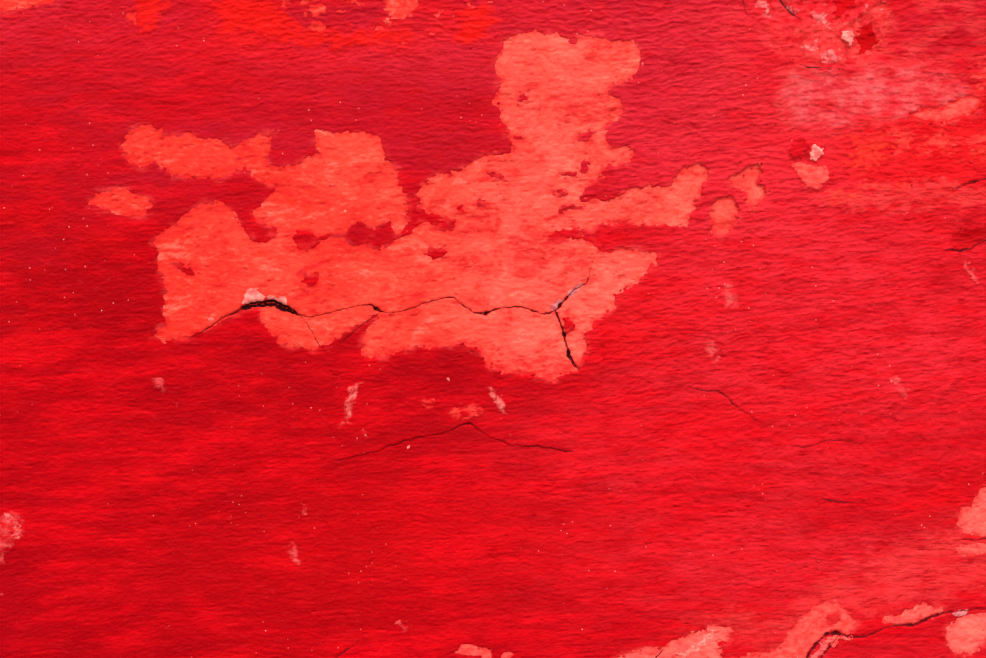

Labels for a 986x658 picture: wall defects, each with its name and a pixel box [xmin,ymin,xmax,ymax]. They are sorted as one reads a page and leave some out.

peeling [281,0,365,35]
peeling [375,0,419,30]
peeling [121,29,709,383]
peeling [709,163,767,234]
crack [192,250,600,370]
peeling [955,487,986,558]
peeling [451,643,514,658]
peeling [618,599,859,658]
crack [806,608,985,658]
peeling [882,602,986,657]